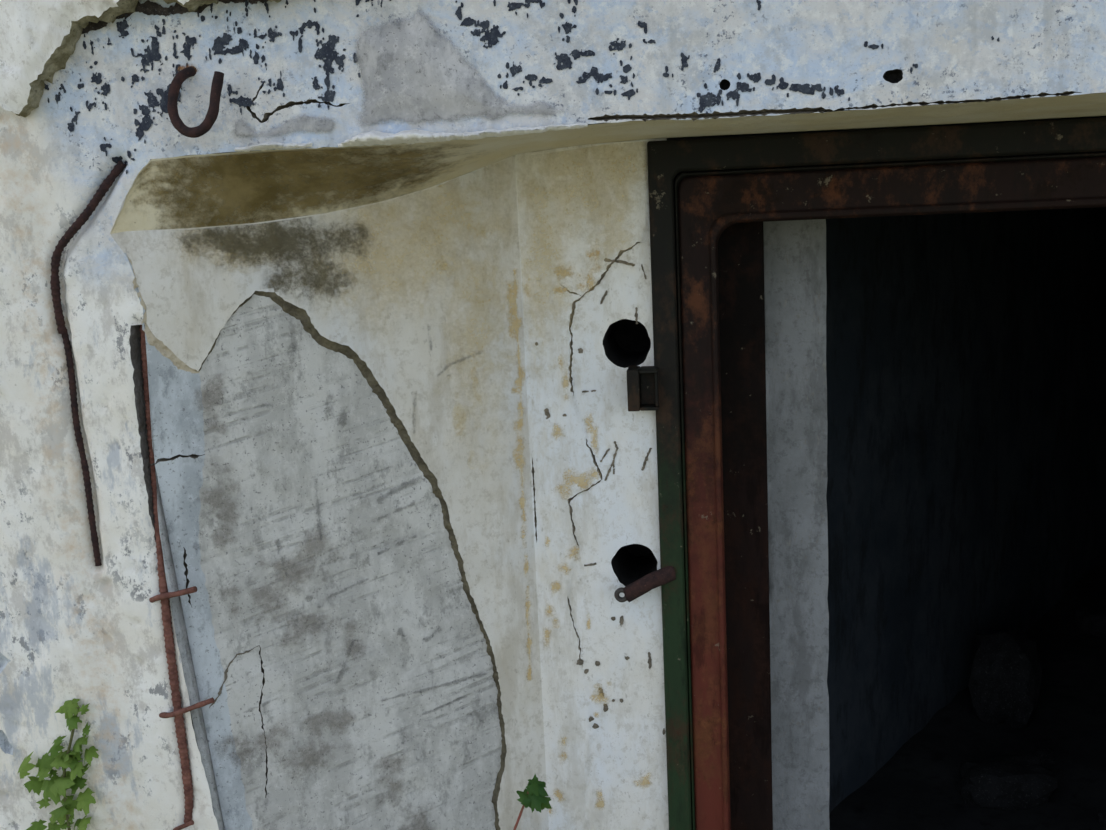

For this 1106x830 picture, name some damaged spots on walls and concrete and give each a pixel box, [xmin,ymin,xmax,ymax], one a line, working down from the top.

crack [246,83,350,123]
crack [560,242,640,396]
flaking render [124,253,507,830]
crack [530,458,538,542]
crack [568,439,602,547]
crack [567,597,583,666]
flaking render [0,730,14,755]
crack [209,645,268,798]